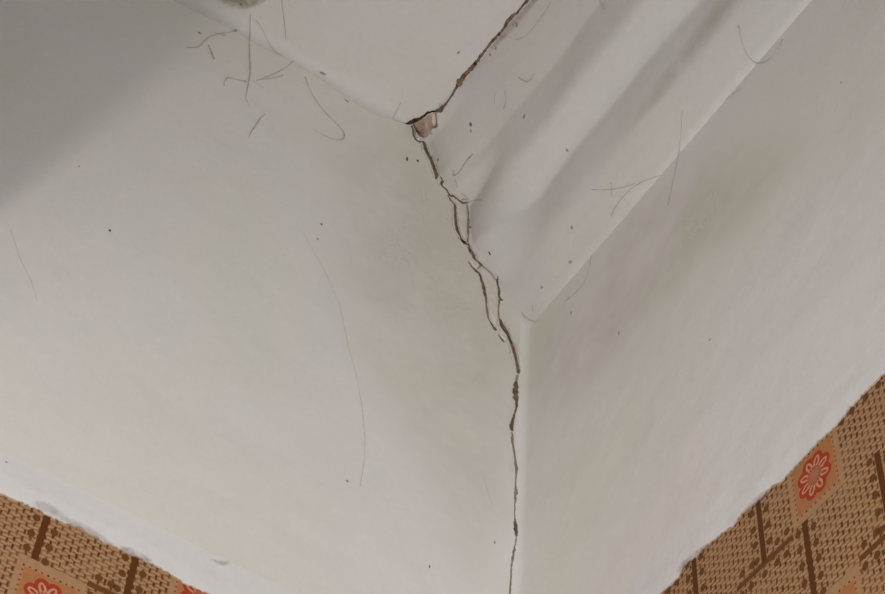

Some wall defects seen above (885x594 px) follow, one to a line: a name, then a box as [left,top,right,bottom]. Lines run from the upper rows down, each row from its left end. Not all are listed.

spalling [413,112,438,140]
crack [405,0,529,594]